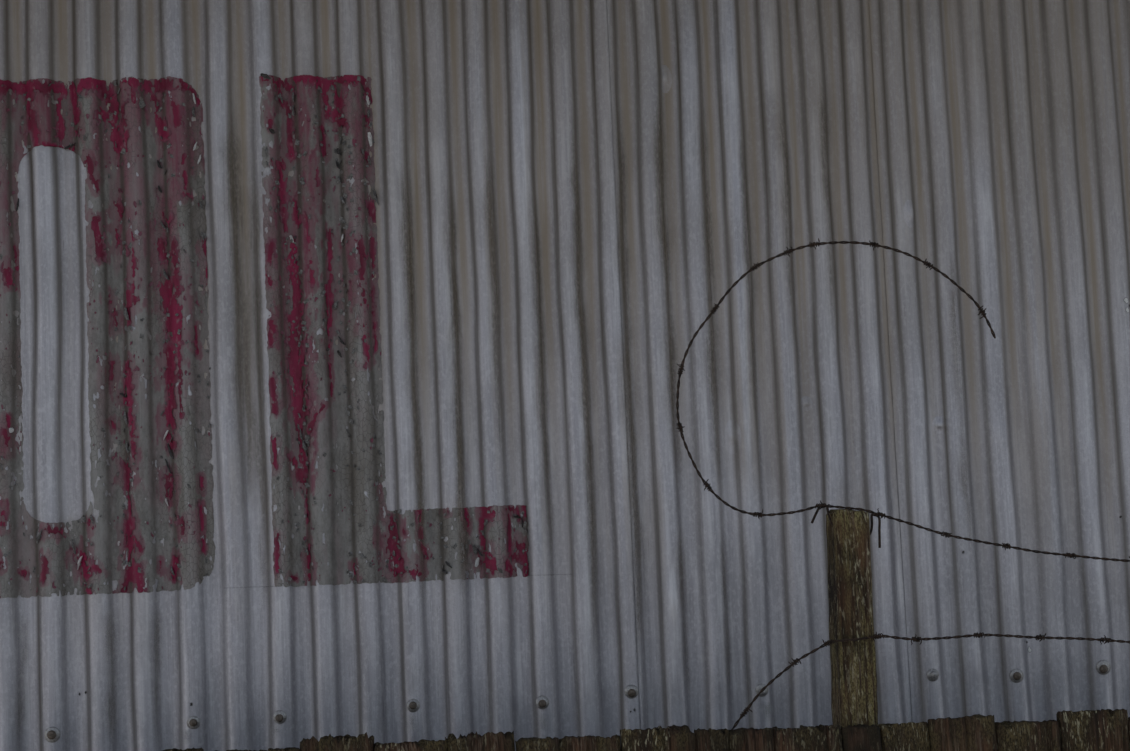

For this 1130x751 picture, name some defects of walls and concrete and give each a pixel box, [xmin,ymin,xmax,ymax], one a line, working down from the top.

peeling [0,77,210,595]
peeling [260,73,529,584]